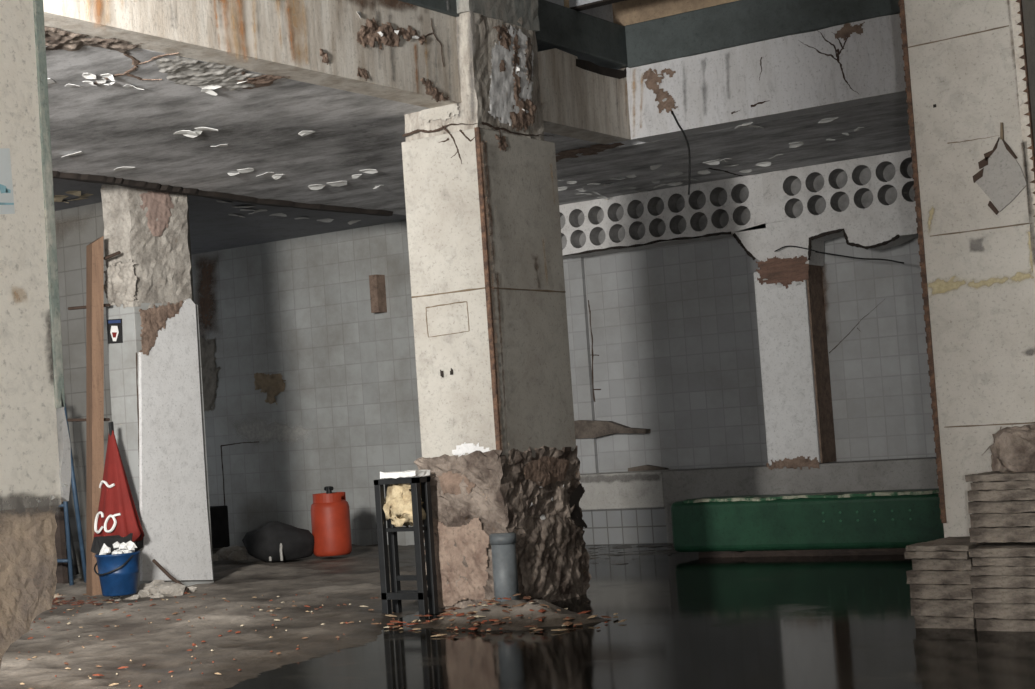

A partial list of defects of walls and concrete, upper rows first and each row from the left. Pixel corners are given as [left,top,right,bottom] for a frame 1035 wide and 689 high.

corrosion [87,0,101,22]
spalling [45,26,144,54]
crack [93,53,178,85]
spalling [355,0,426,50]
spalling [488,24,537,152]
crack [801,31,859,94]
crack [402,122,553,164]
crack [808,229,900,260]
spalling [756,255,809,289]
spalling [104,259,183,355]
spalling [200,336,221,412]
spalling [414,442,592,612]